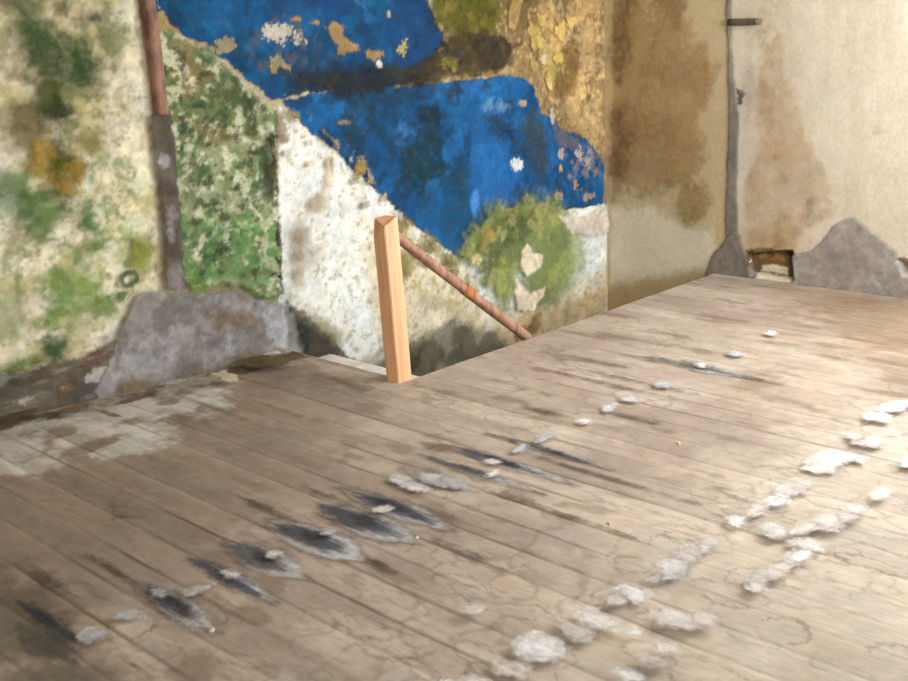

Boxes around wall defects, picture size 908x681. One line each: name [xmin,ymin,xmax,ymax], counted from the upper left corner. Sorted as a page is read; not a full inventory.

peeling [155,0,610,258]
water stain [614,0,712,222]
flaking render [747,248,794,278]